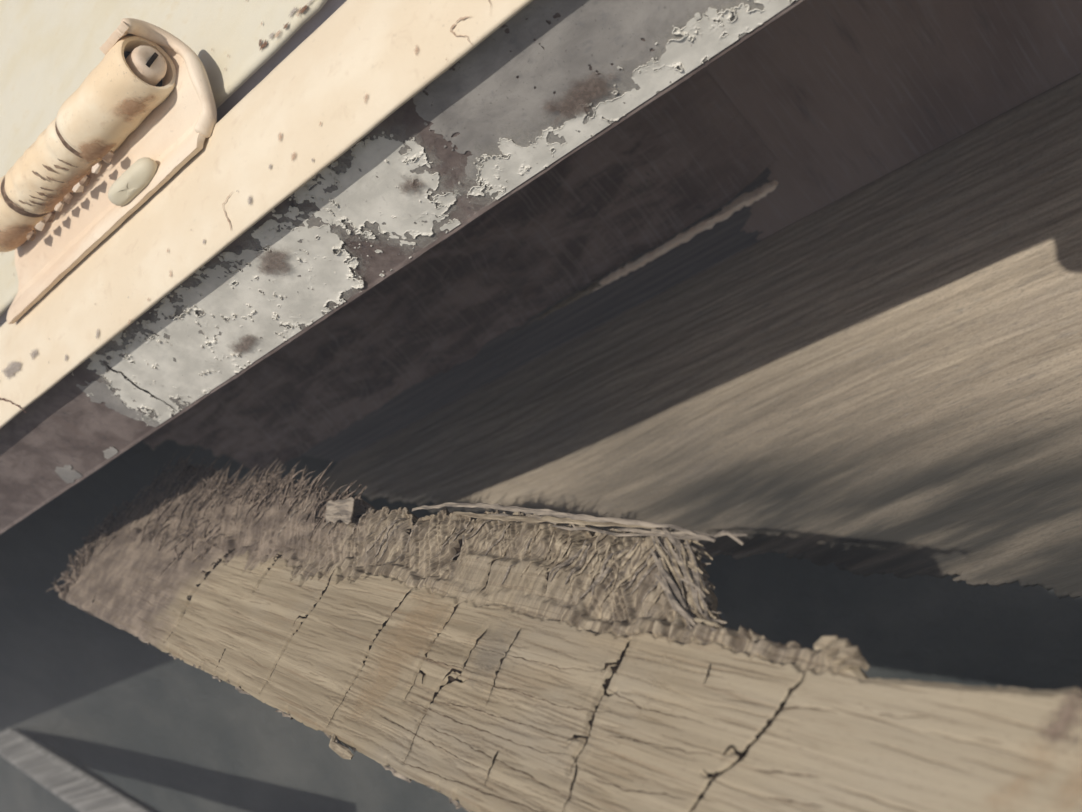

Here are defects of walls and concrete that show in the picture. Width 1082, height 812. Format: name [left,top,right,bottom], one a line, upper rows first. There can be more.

peeling [72,0,797,428]
crack [101,360,175,410]
peeling [55,465,83,484]
peeling [103,446,118,459]
crack [169,549,235,636]
crack [264,571,334,686]
peeling [325,497,355,525]
crack [327,590,411,726]
crack [451,539,463,562]
crack [380,559,838,812]